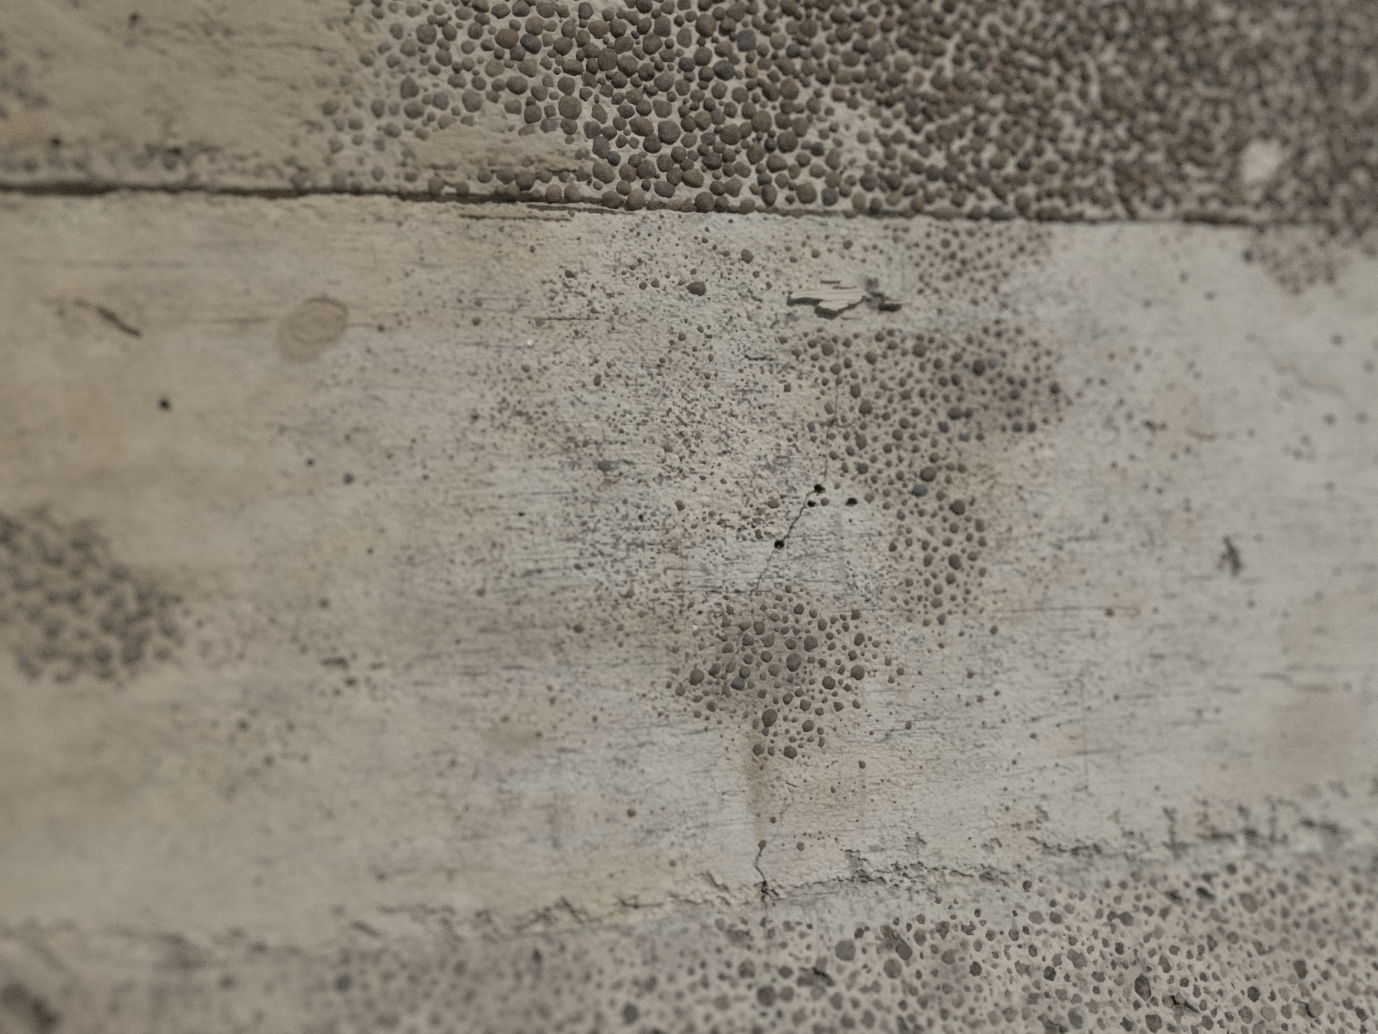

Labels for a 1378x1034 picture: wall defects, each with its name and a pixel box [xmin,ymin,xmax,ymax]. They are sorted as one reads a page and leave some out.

crack [755,849,766,901]